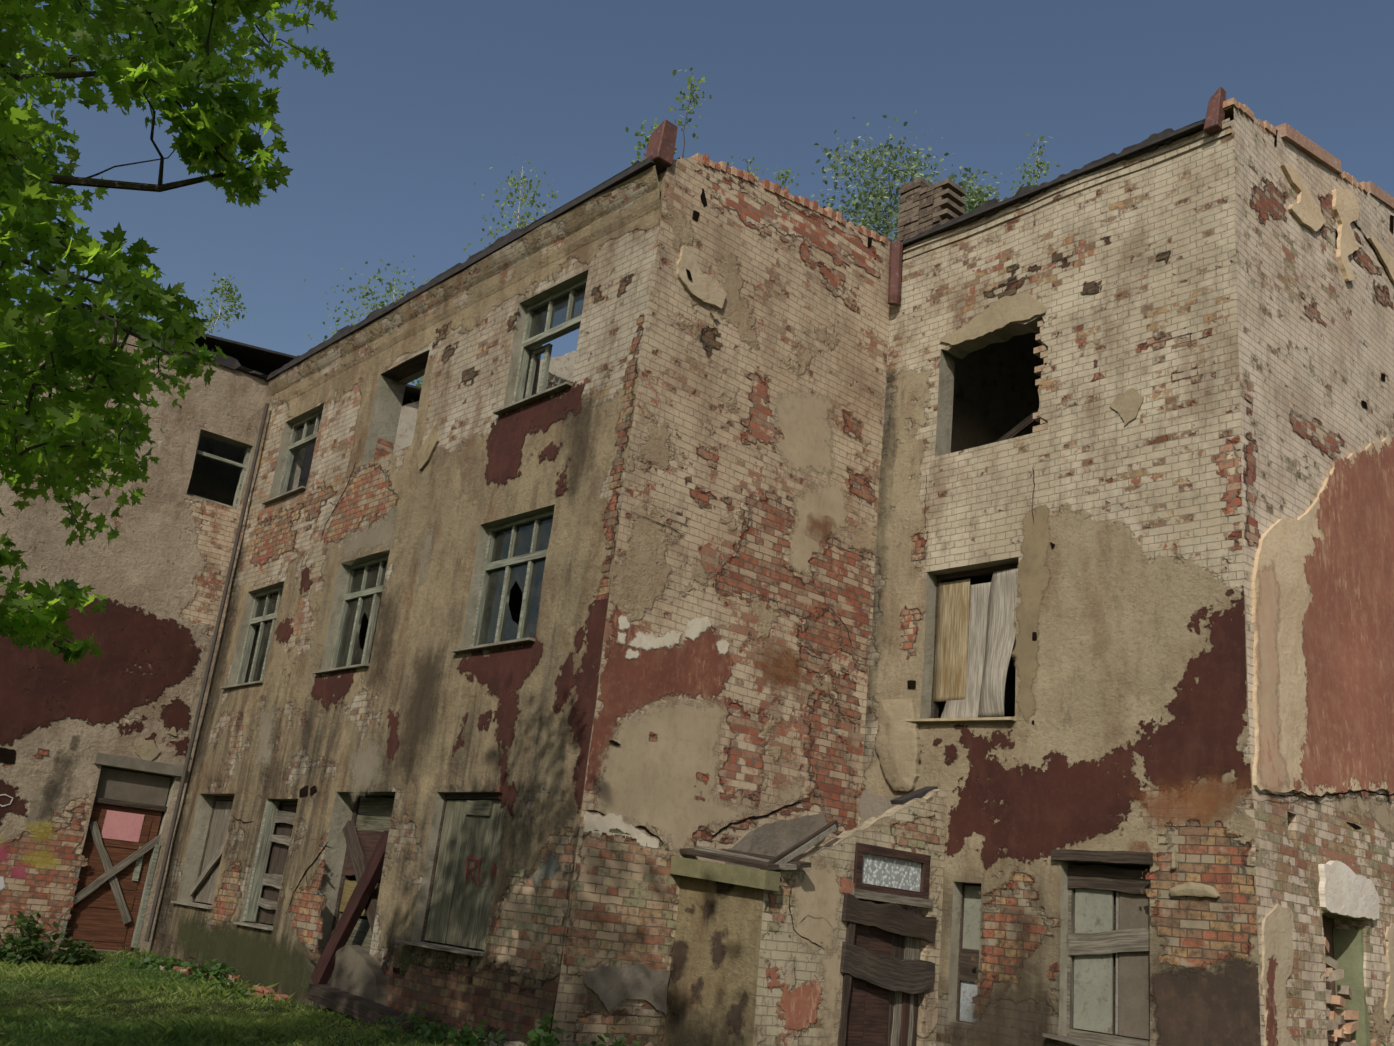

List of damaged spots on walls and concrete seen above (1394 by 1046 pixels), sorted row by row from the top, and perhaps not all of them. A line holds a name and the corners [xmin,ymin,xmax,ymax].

flaking render [591,273,634,304]
peeling [676,245,726,357]
flaking render [692,173,881,313]
flaking render [249,462,401,595]
peeling [0,596,201,949]
crack [587,810,666,850]
peeling [381,313,876,1046]
crack [701,795,815,846]
peeling [890,408,1394,1046]
crack [1260,789,1394,803]
water stain [666,998,728,1046]
water stain [1151,958,1261,1046]